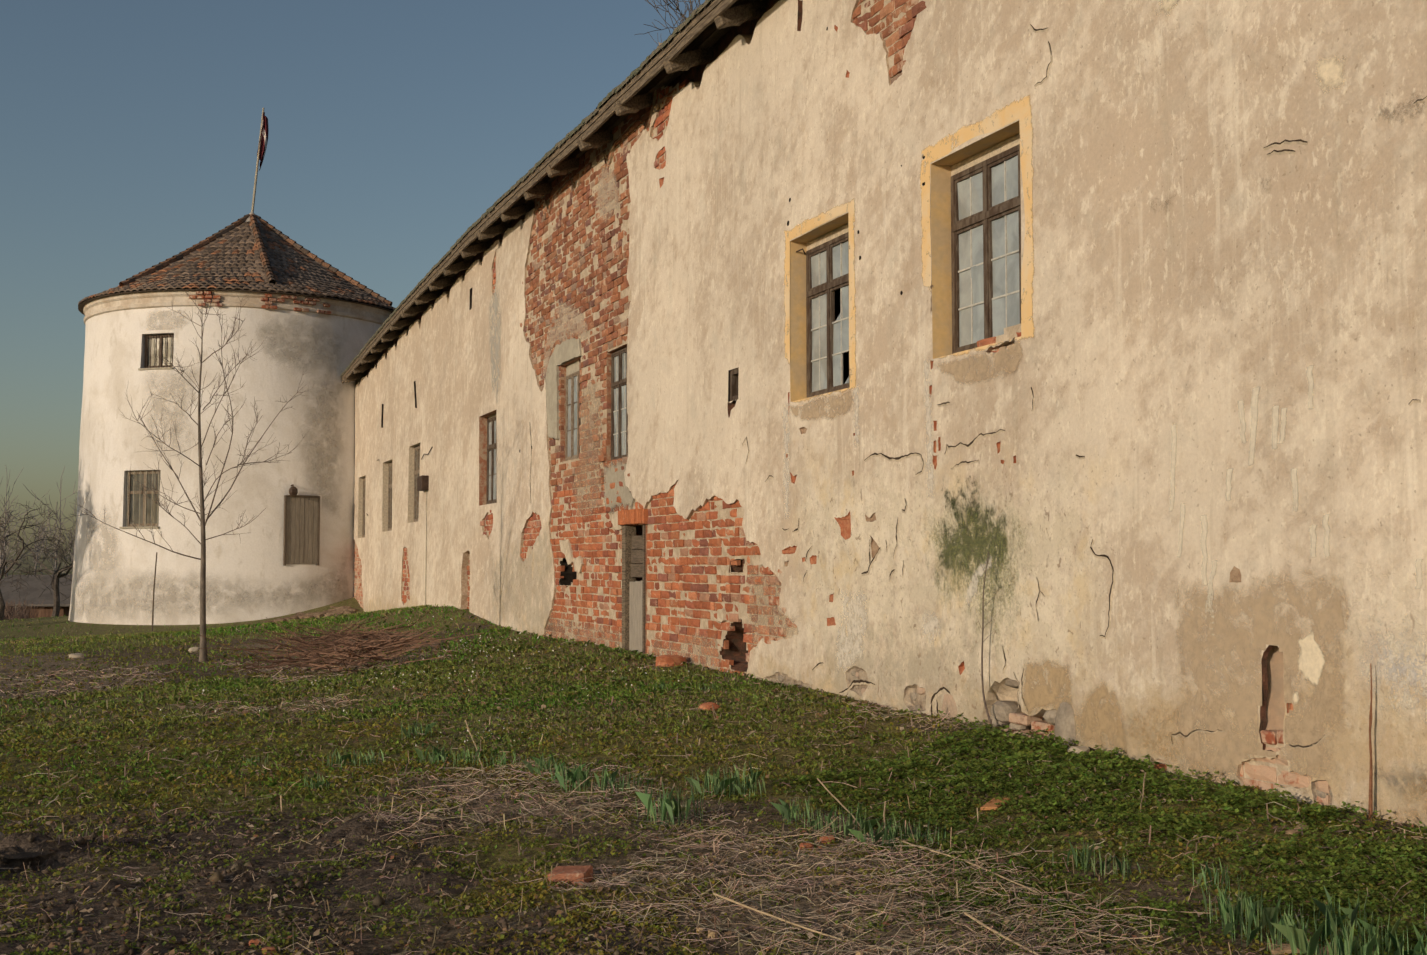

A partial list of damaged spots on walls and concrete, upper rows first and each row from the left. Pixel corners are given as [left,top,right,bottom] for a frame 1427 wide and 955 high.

flaking render [834,0,926,86]
crack [1029,24,1053,88]
crack [1414,96,1427,106]
crack [1263,139,1307,157]
flaking render [520,79,817,676]
crack [861,387,1035,583]
crack [1089,539,1115,639]
flaking render [764,672,813,689]
peeling [1286,632,1325,713]
flaking render [1236,645,1333,806]